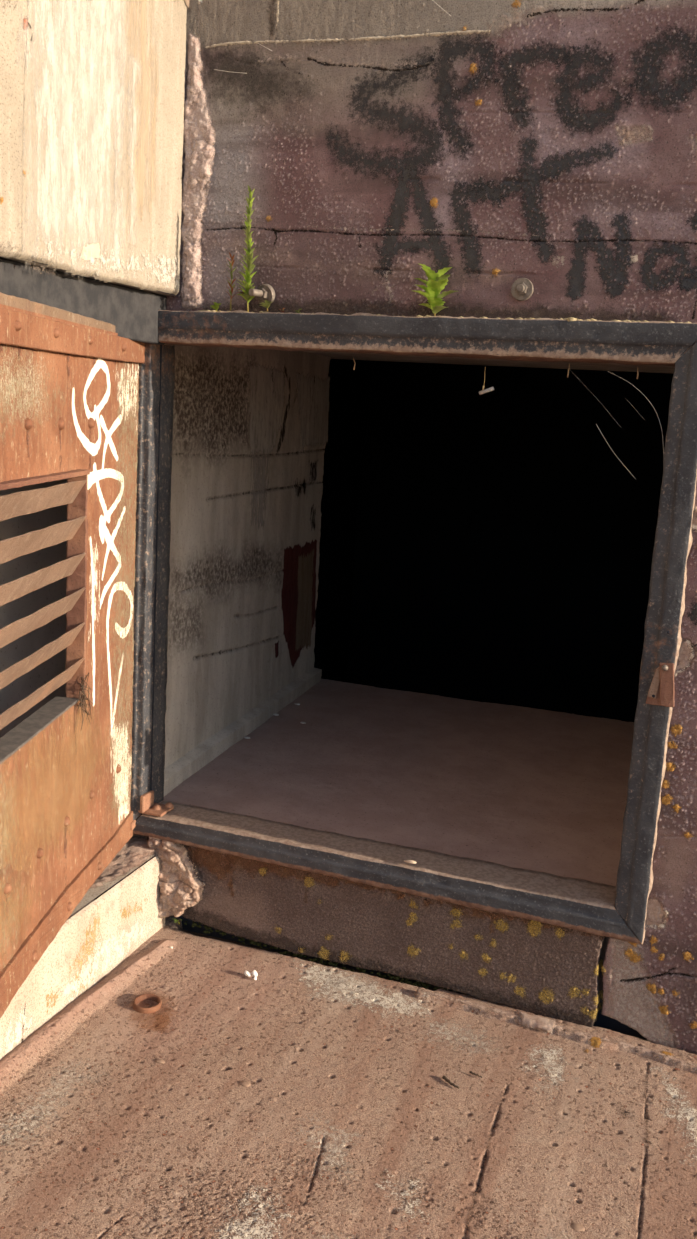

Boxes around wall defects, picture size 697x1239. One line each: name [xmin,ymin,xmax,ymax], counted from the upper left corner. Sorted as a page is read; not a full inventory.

damp [25,0,138,271]
crack [206,225,697,248]
peeling [275,461,317,667]
crack [620,966,697,983]
crack [465,1084,508,1232]
crack [637,1063,661,1239]